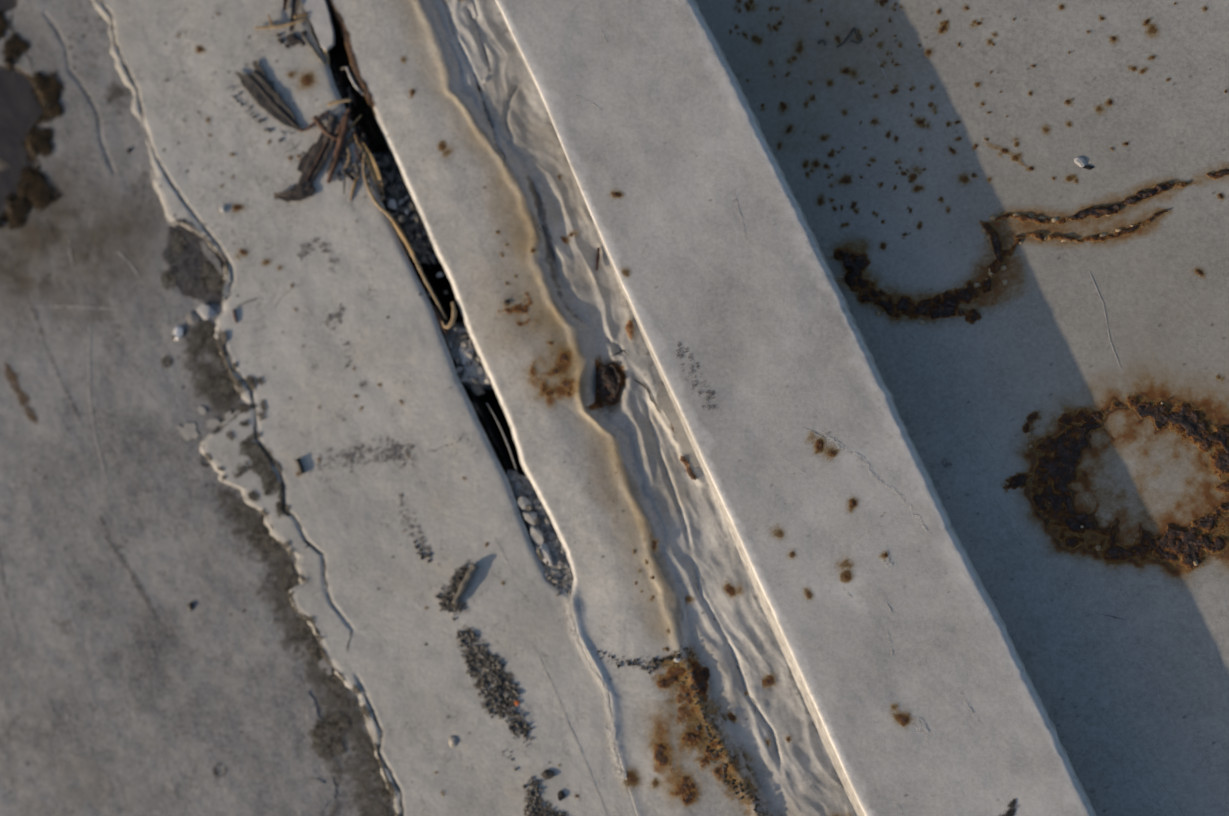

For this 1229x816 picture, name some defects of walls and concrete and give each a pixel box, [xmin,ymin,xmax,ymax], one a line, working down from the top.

spalling [0,0,64,230]
crack [99,0,233,286]
spalling [172,304,216,340]
peeling [177,406,232,441]
peeling [197,238,232,298]
crack [224,345,352,650]
crack [311,0,578,578]
rust [529,341,575,406]
rust [831,167,1229,325]
rust [1003,378,1229,578]
crack [358,679,404,816]
rust [624,629,757,812]